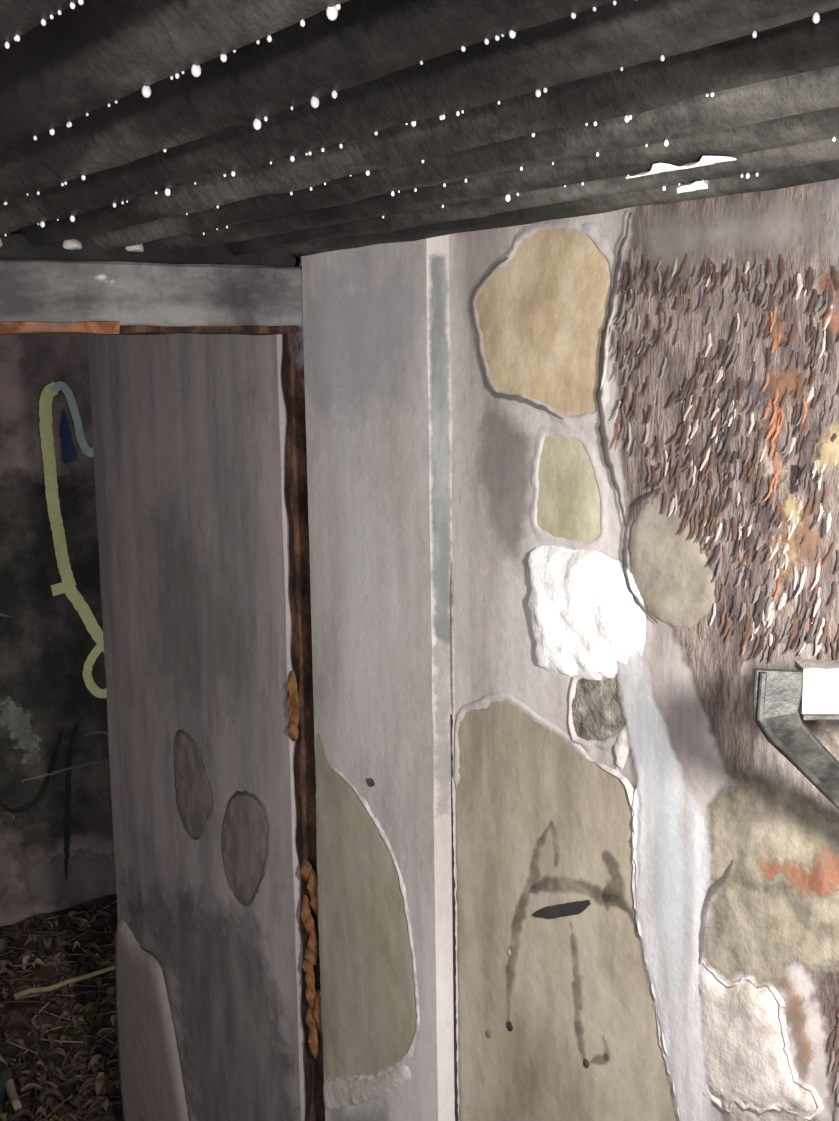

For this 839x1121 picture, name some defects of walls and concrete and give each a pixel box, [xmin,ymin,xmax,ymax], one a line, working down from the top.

rust [287,670,300,742]
peeling [454,179,839,1121]
water stain [128,885,294,1121]
rust [300,859,322,1059]
spalling [315,733,420,1111]
rust [760,849,839,897]